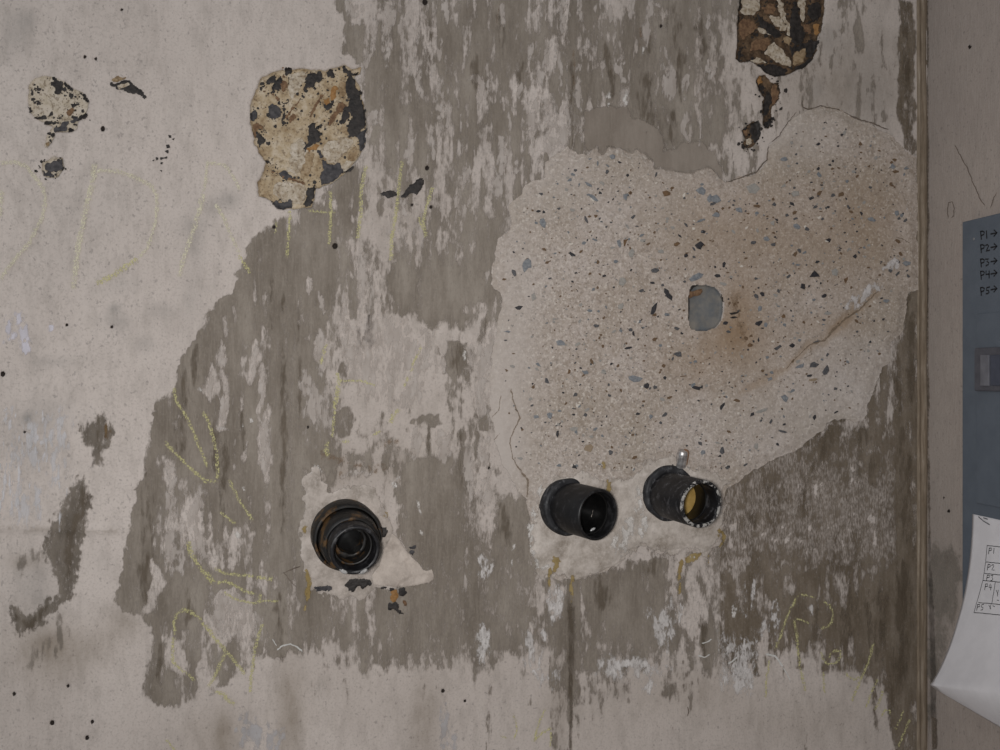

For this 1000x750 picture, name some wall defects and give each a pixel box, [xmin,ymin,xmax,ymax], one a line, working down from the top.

spalling [110,76,147,99]
spalling [28,76,91,180]
spalling [250,65,367,210]
spalling [489,0,918,553]
crack [787,292,877,368]
leakage [845,283,882,310]
leakage [79,415,115,465]
leakage [340,443,377,479]
crack [494,391,529,495]
leakage [0,412,92,637]
leakage [611,486,648,554]
leakage [662,682,676,699]